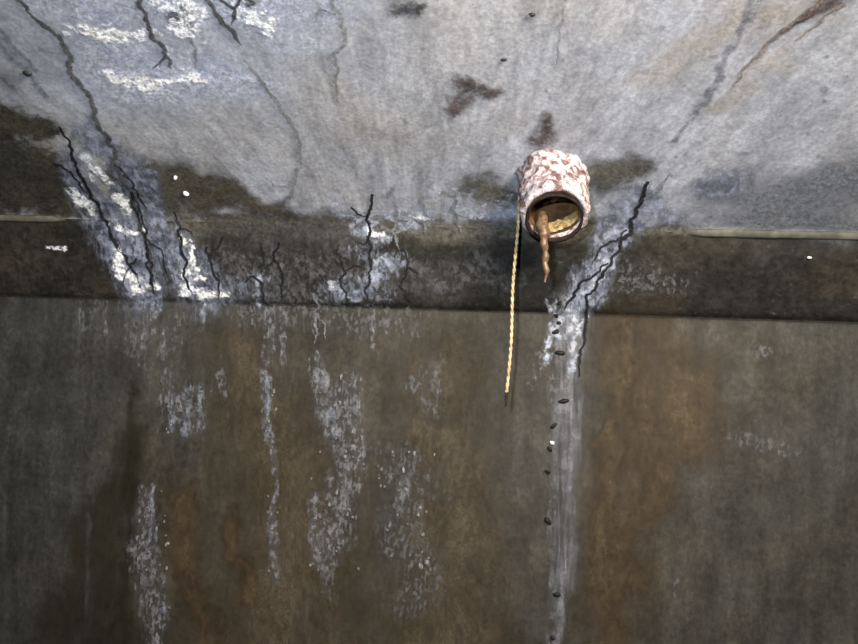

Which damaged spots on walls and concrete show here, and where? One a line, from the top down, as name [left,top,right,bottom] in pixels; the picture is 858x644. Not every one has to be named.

damp [390,1,427,15]
rust [788,0,842,30]
crack [15,0,224,298]
crack [135,0,302,208]
crack [245,240,284,307]
crack [338,187,419,305]
rust [447,76,501,116]
crack [564,173,670,378]
damp [694,44,737,114]
damp [694,159,858,230]
damp [0,103,539,644]
damp [533,154,690,644]